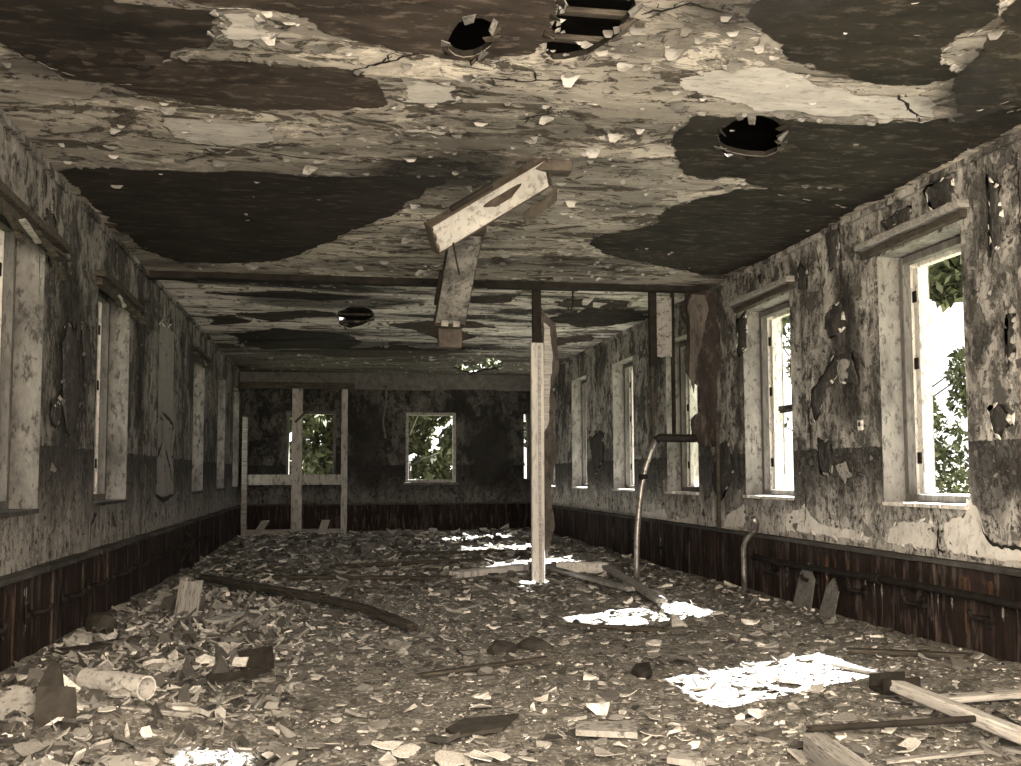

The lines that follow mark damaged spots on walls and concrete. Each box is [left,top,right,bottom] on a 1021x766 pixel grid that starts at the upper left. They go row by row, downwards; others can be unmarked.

peeling [0,0,566,154]
peeling [587,0,1021,277]
peeling [58,166,437,265]
peeling [797,261,808,294]
peeling [823,297,846,339]
peeling [50,321,81,438]
peeling [810,351,860,423]
peeling [986,402,1016,440]
peeling [711,441,734,501]
spalling [723,505,746,529]